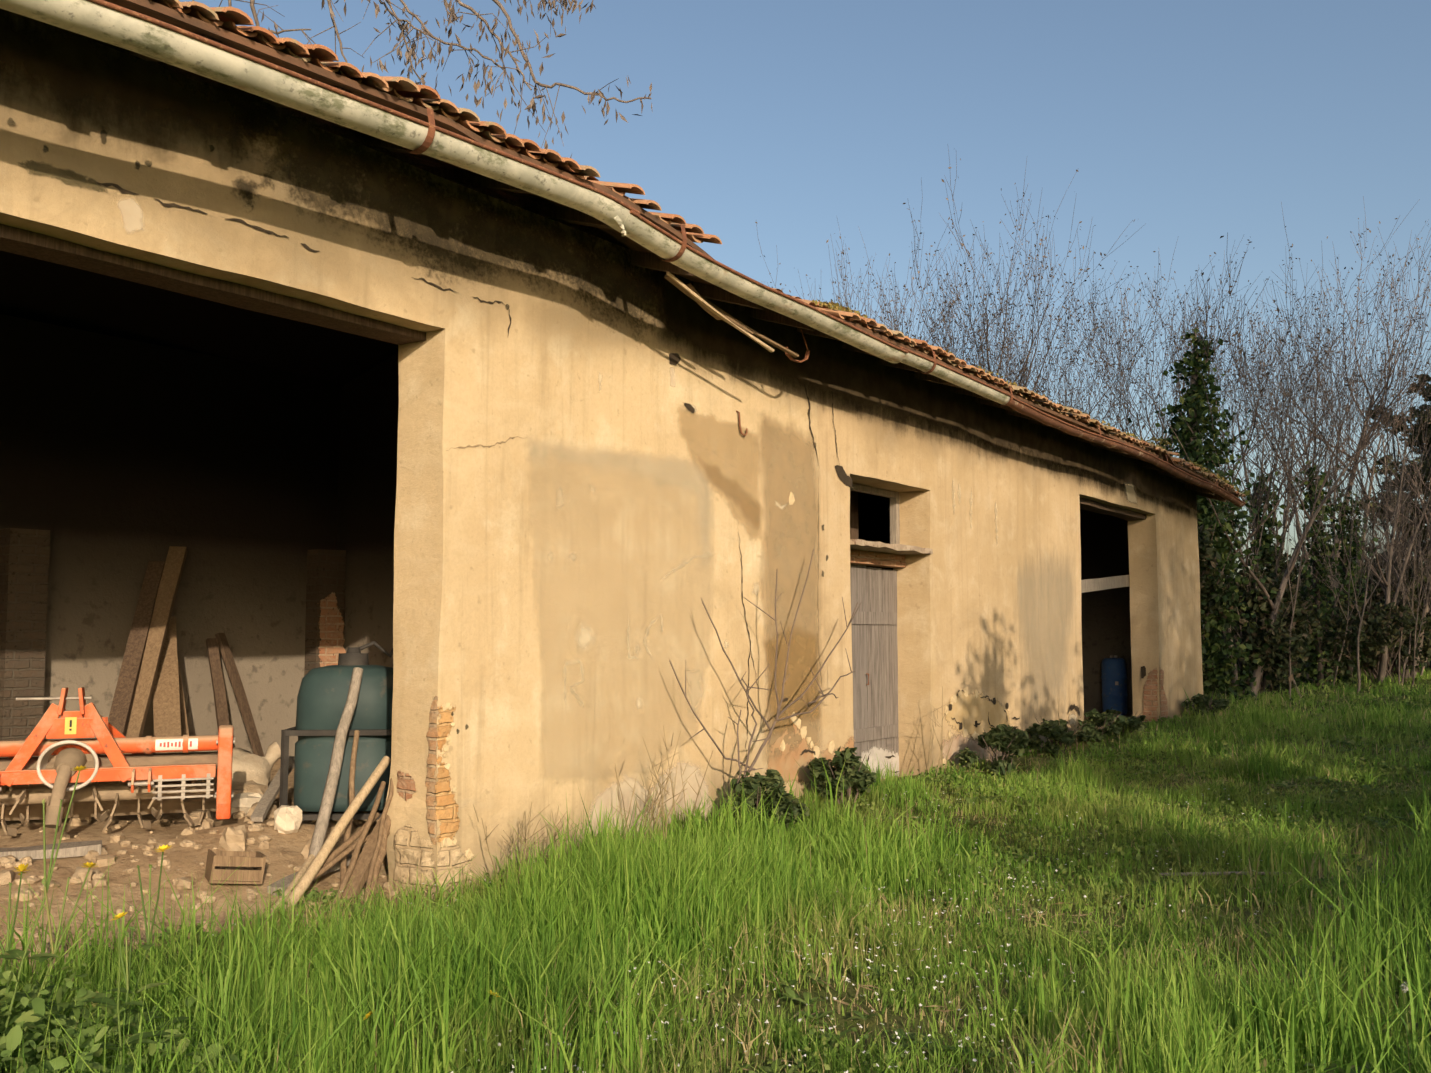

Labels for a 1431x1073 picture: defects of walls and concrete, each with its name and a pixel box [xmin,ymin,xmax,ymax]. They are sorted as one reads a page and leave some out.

leakage [0,8,1198,516]
crack [806,391,840,466]
spalling [318,592,346,667]
spalling [393,696,474,903]
leakage [762,419,819,753]
peeling [942,687,1027,769]